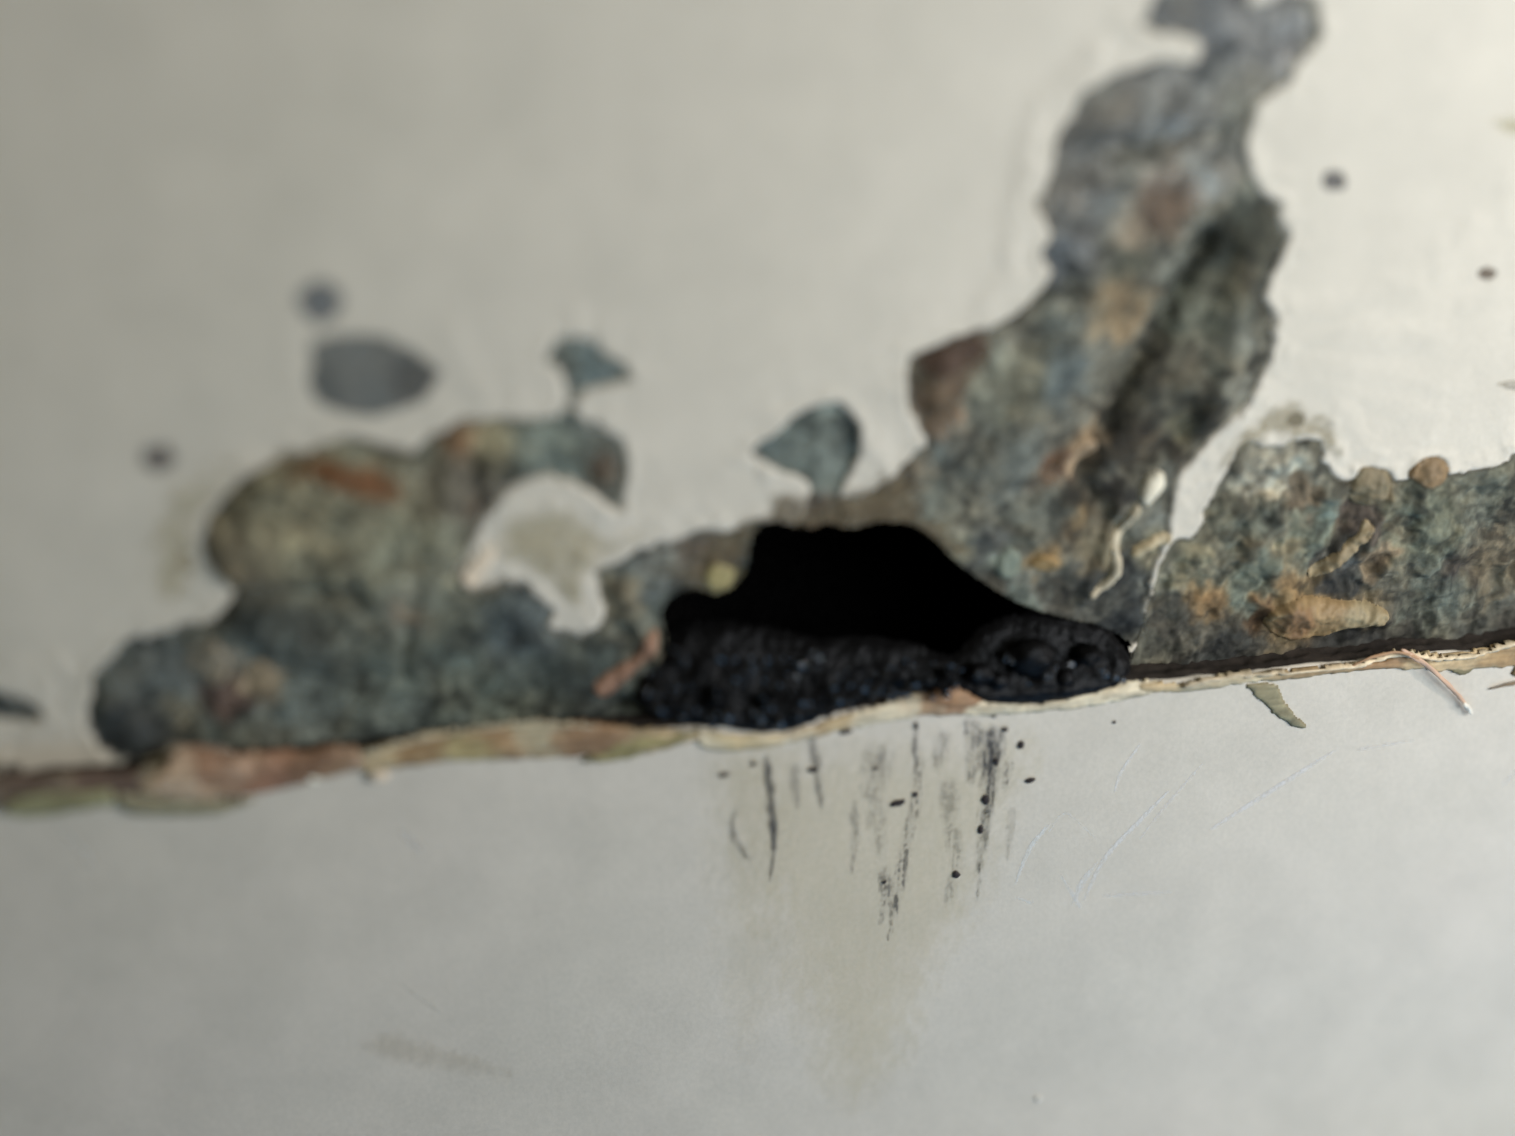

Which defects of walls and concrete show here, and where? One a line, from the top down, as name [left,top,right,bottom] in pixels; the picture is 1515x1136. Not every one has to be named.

spalling [0,0,1515,817]
corrosion [918,343,987,377]
leakage [689,481,964,589]
leakage [765,763,776,851]
leakage [972,730,1001,841]